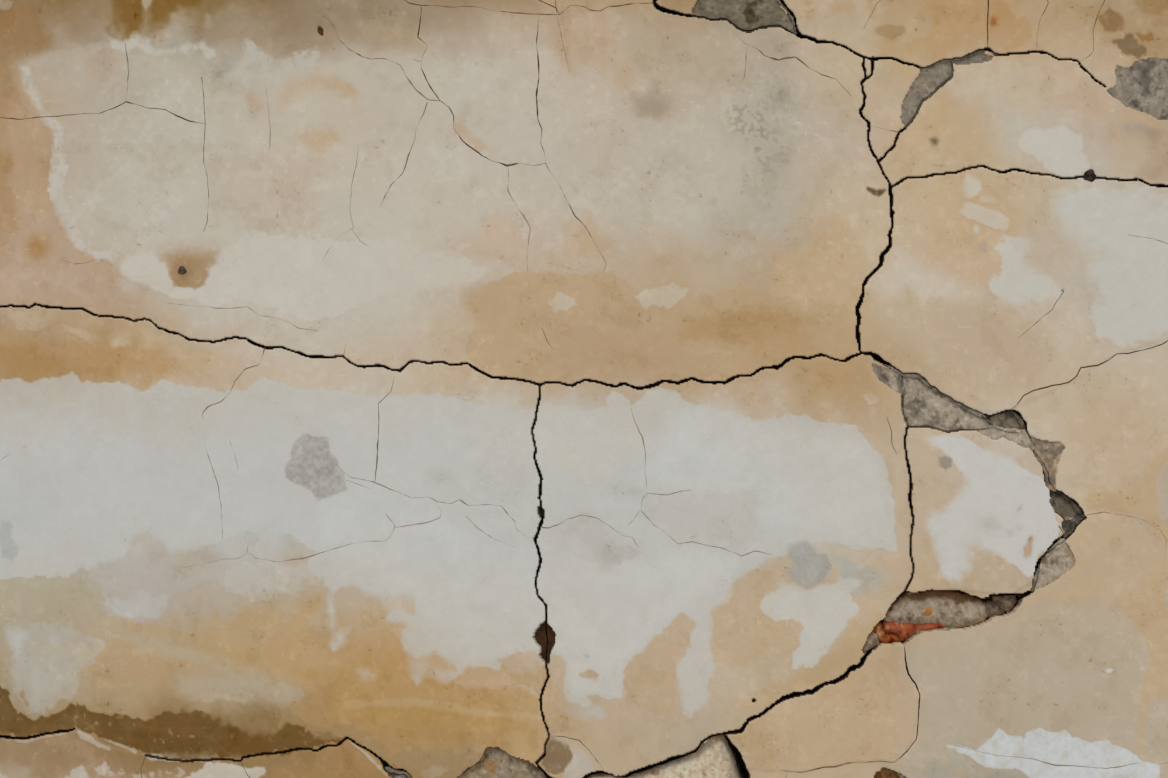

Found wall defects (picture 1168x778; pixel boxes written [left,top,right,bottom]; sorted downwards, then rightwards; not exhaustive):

spalling [692,0,797,35]
spalling [900,50,999,130]
spalling [1107,58,1168,120]
crack [0,0,1168,439]
crack [532,386,549,746]
crack [887,406,959,594]
peeling [862,364,1087,653]
peeling [1,728,267,778]
crack [140,737,411,778]
water stain [0,615,563,778]
crack [556,645,876,778]
peeling [941,727,1162,778]